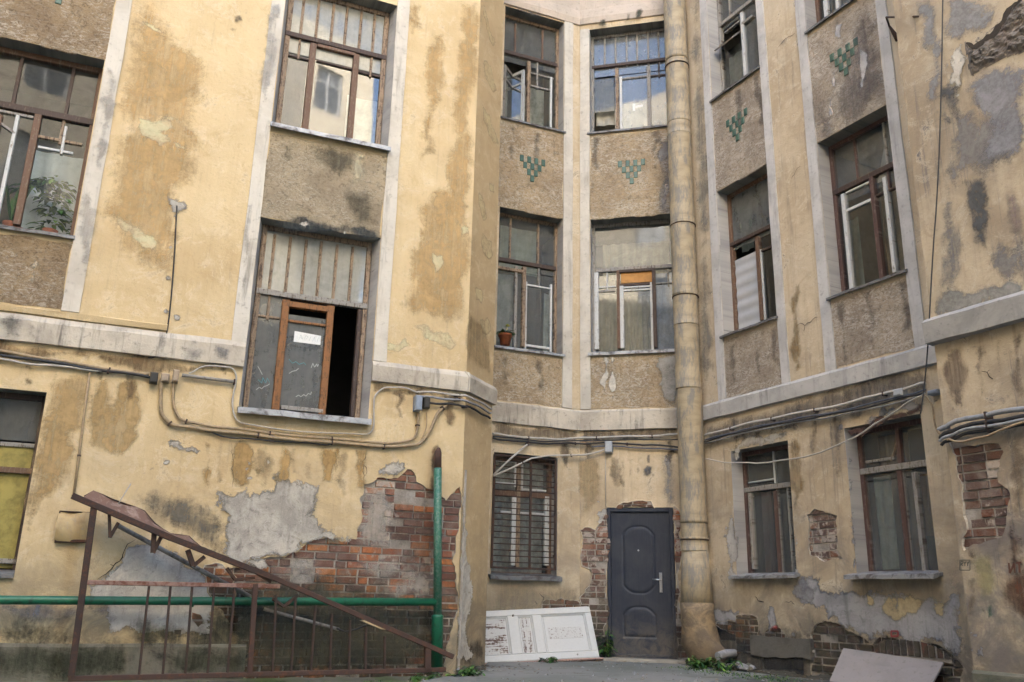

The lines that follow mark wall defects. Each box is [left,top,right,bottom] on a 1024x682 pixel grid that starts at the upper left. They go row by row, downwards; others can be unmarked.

damp [108,15,199,263]
damp [411,7,479,318]
damp [919,0,1024,243]
damp [936,202,1024,315]
damp [29,379,140,514]
peeling [168,440,200,453]
flaking render [943,420,1010,552]
flaking render [88,460,473,678]
flaking render [535,499,655,657]
peeling [714,608,739,625]
peeling [765,606,795,638]
peeling [794,509,984,682]